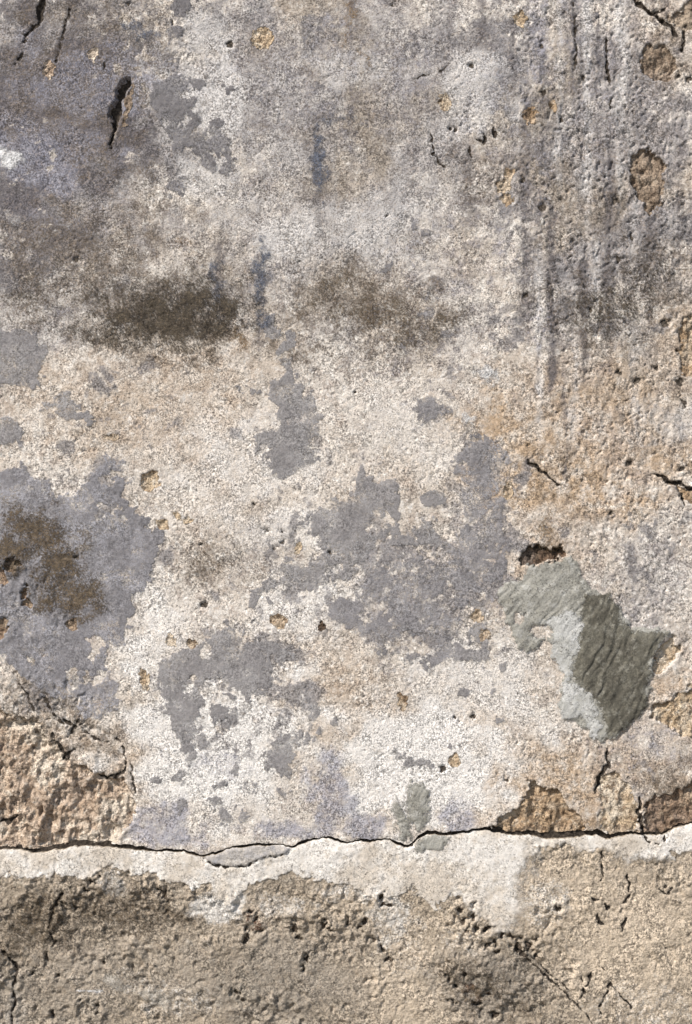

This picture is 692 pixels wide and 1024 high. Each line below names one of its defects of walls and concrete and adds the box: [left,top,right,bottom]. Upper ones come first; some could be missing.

crack [14,0,71,65]
crack [634,0,688,52]
crack [103,62,131,150]
leakage [67,235,271,367]
leakage [307,265,466,355]
crack [527,459,560,486]
crack [655,474,692,511]
leakage [0,500,108,624]
peeling [248,433,566,694]
crack [18,683,136,796]
peeling [0,697,692,1023]
crack [0,797,692,932]